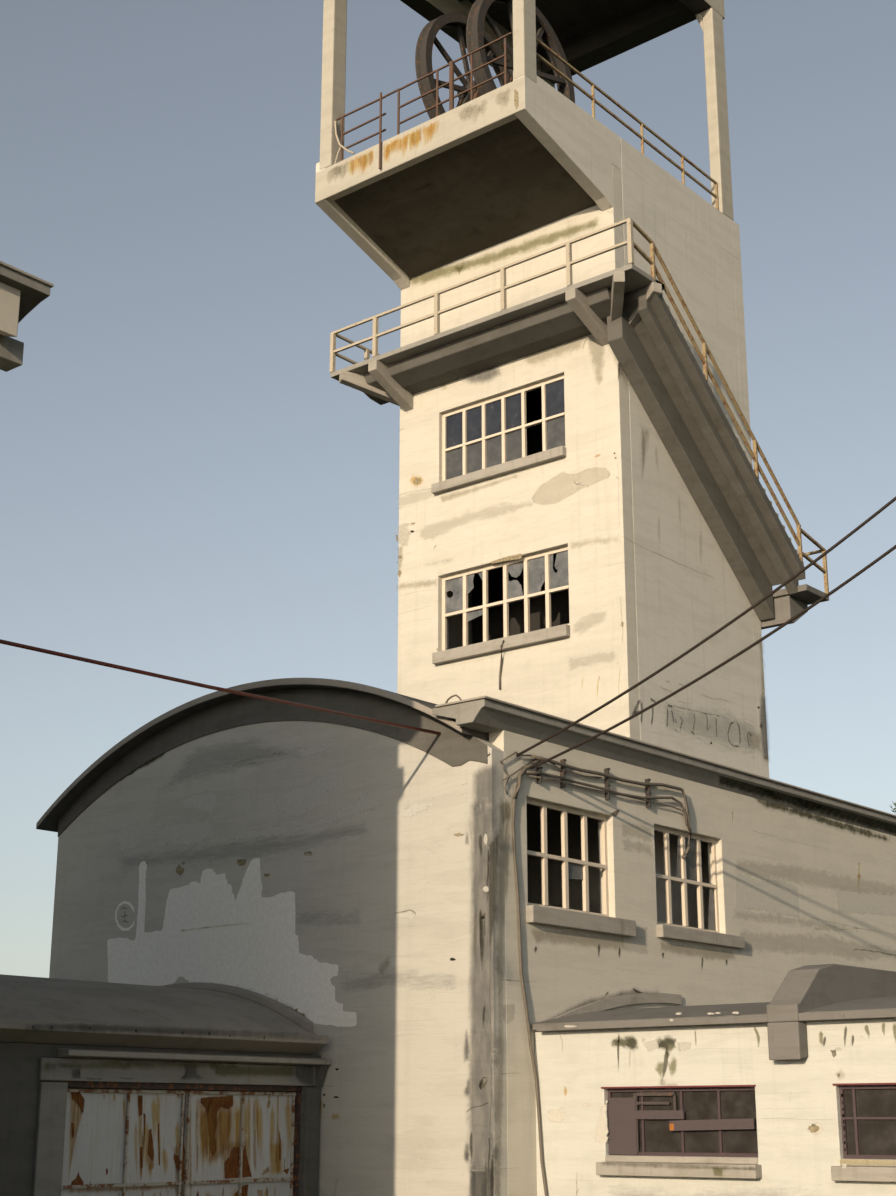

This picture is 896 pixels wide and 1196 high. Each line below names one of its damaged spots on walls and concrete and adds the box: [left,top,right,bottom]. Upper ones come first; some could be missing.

damp [616,1038,691,1051]
rust [70,1088,85,1138]
rust [138,1095,185,1181]
rust [201,1096,252,1196]